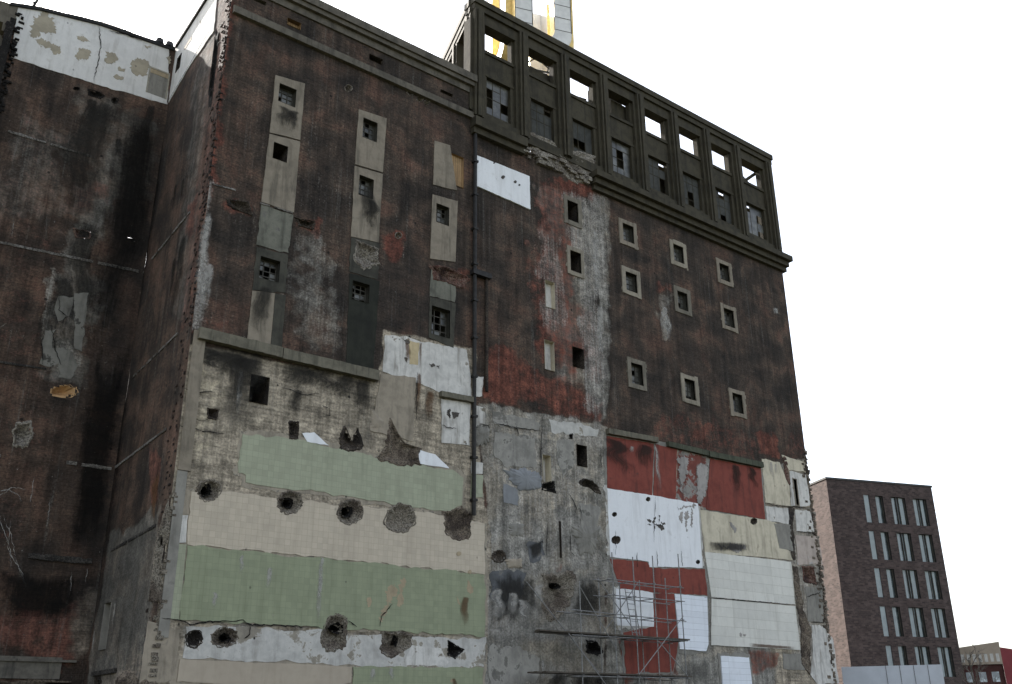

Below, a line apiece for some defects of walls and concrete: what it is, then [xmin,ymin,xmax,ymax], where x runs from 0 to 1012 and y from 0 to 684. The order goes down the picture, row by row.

peeling [0,12,61,113]
crack [94,25,142,77]
peeling [104,45,152,80]
spalling [524,132,596,185]
damp [43,99,162,331]
spalling [50,384,79,398]
spalling [377,418,422,467]
spalling [383,502,416,533]
spalling [441,506,473,556]
peeling [676,456,709,532]
damp [2,519,74,617]
spalling [320,613,348,653]